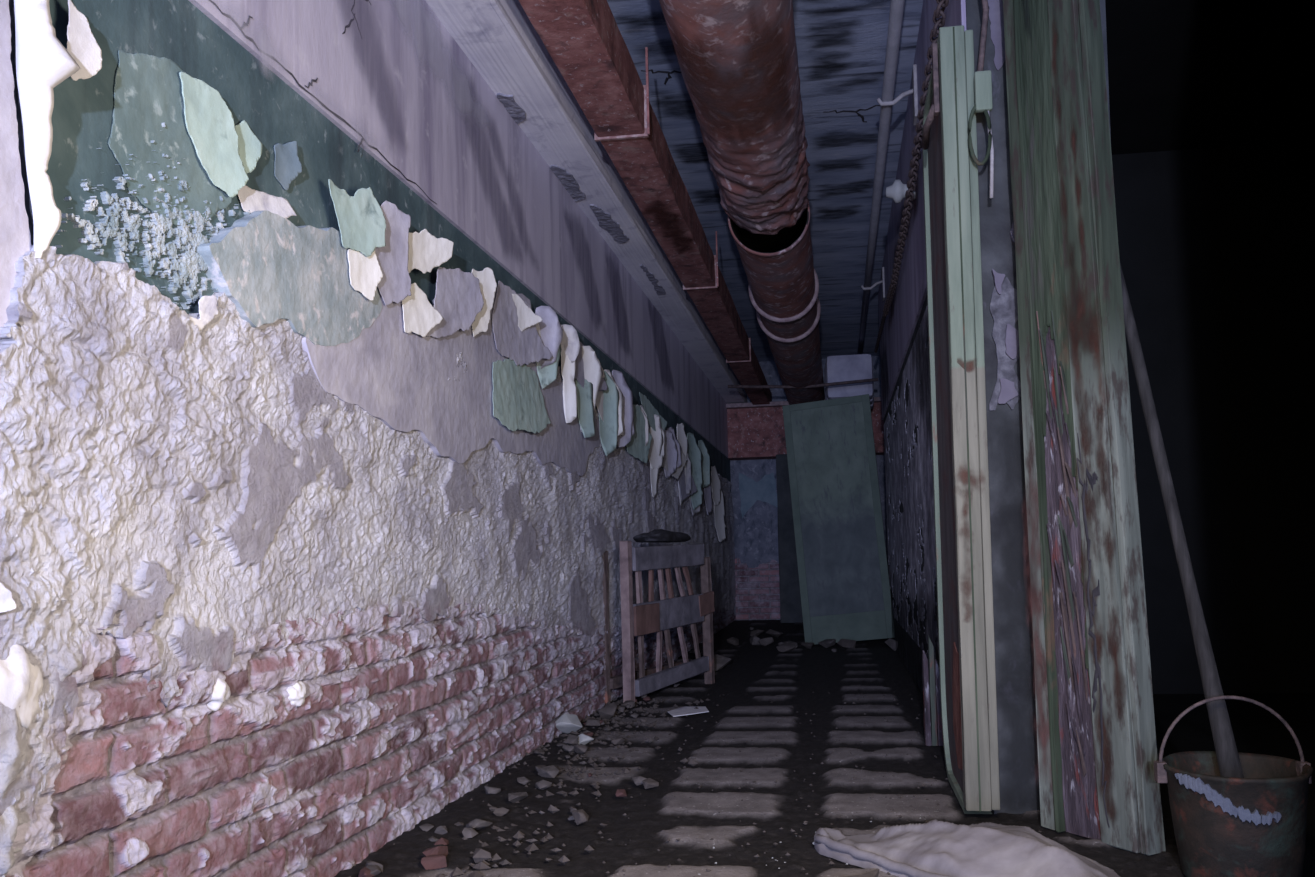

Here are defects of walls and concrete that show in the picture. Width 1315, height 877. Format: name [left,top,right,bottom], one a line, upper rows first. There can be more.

flaking render [0,0,780,877]
rust [645,201,692,253]